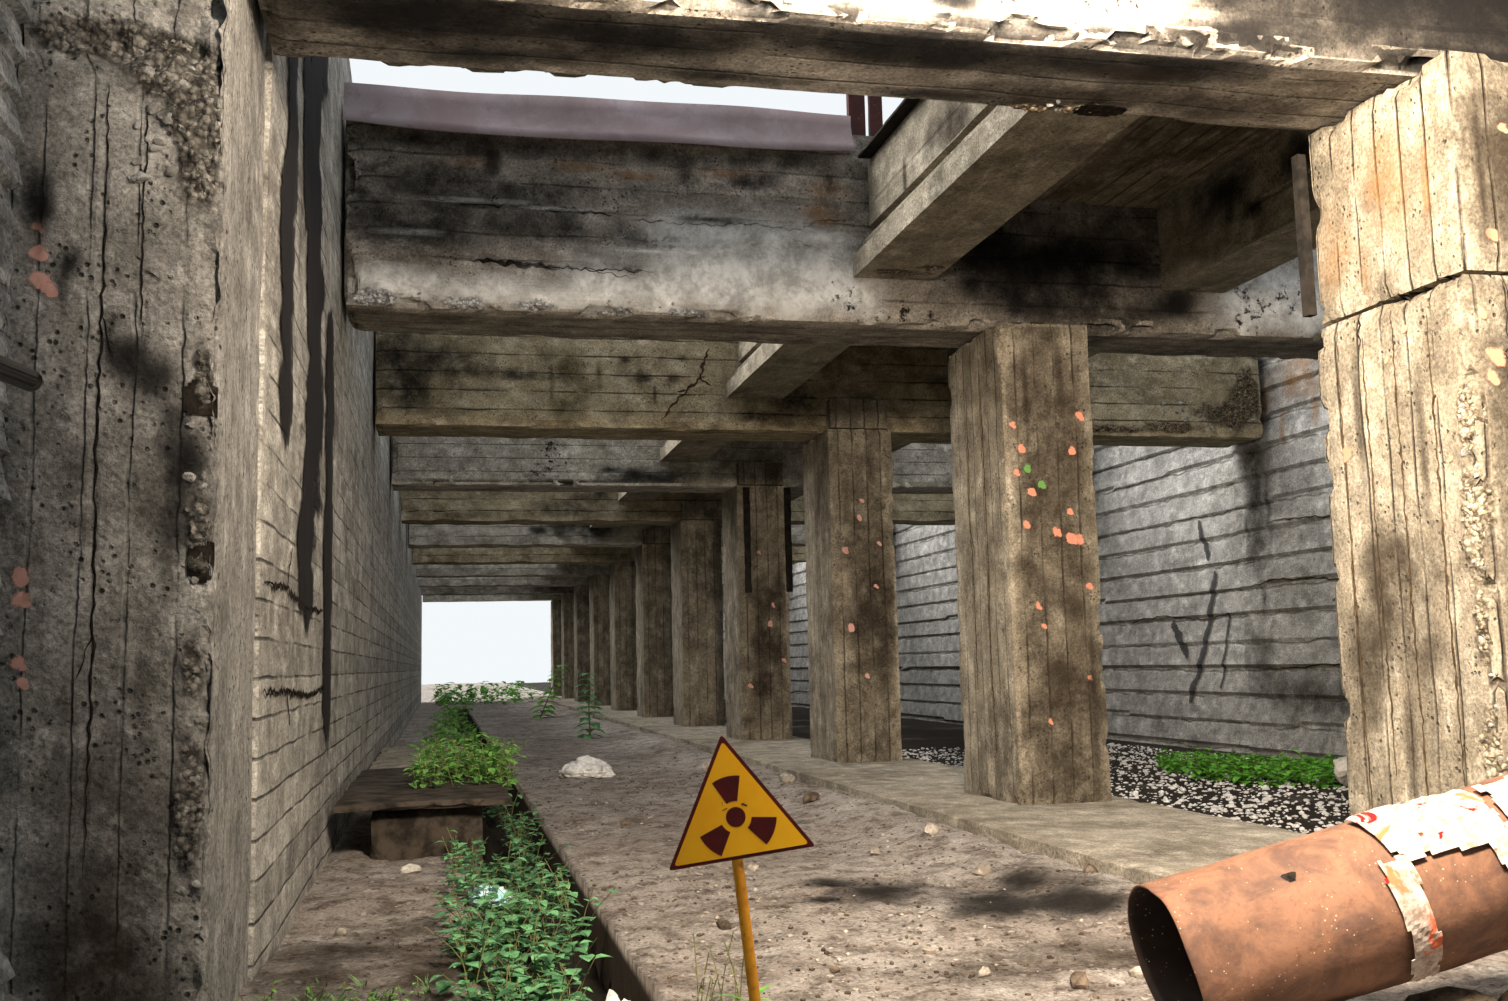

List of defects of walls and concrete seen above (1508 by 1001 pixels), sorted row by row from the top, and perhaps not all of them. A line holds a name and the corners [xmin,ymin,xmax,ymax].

damp [1164,290,1192,314]
crack [661,348,710,420]
damp [1022,370,1102,790]
crack [1126,269,1508,809]
damp [32,857,177,1001]